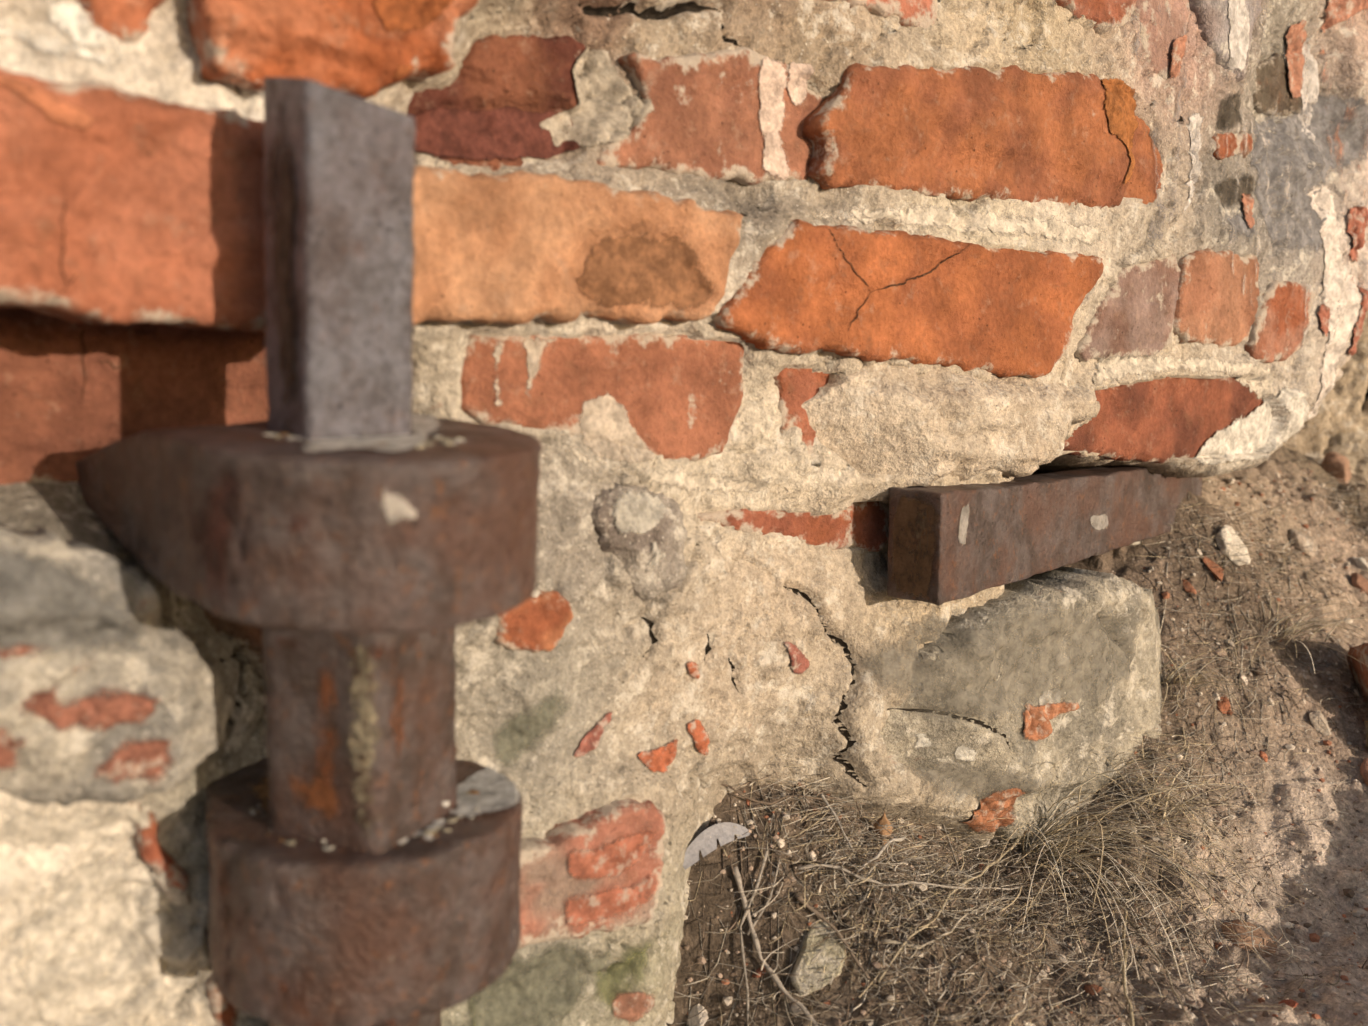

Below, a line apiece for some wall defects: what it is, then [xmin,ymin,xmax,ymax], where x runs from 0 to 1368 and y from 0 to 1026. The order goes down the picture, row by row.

crack [578,1,749,47]
crack [827,228,970,330]
crack [783,586,868,787]
crack [887,708,1013,758]